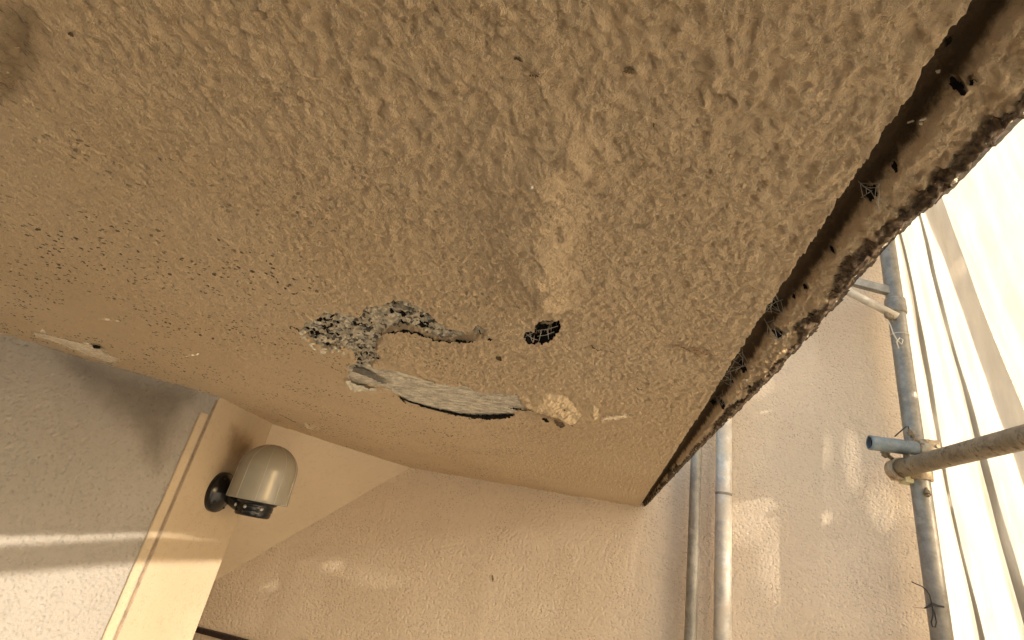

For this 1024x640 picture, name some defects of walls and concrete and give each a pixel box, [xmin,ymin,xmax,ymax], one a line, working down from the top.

spalling [949,76,977,96]
spalling [858,181,882,211]
spalling [764,284,808,342]
spalling [299,300,600,428]
spalling [710,350,766,420]